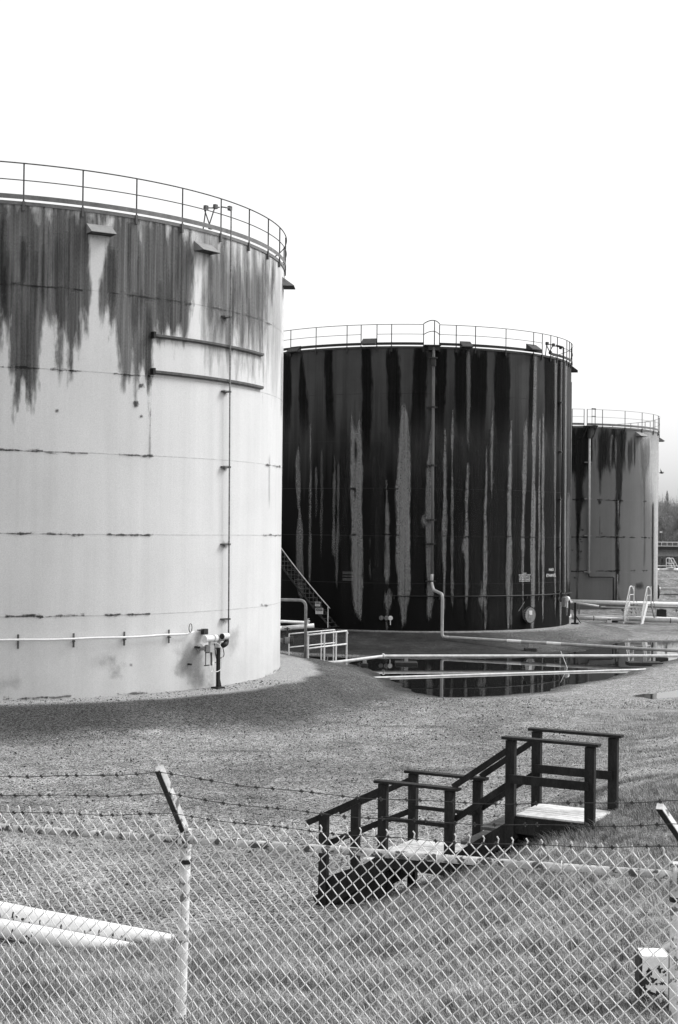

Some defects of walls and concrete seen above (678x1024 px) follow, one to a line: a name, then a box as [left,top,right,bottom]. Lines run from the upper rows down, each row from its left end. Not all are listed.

water stain [0,203,274,403]
water stain [283,354,308,421]
water stain [324,350,333,424]
water stain [362,348,373,448]
water stain [386,348,510,426]
water stain [529,357,561,426]
water stain [571,427,635,601]